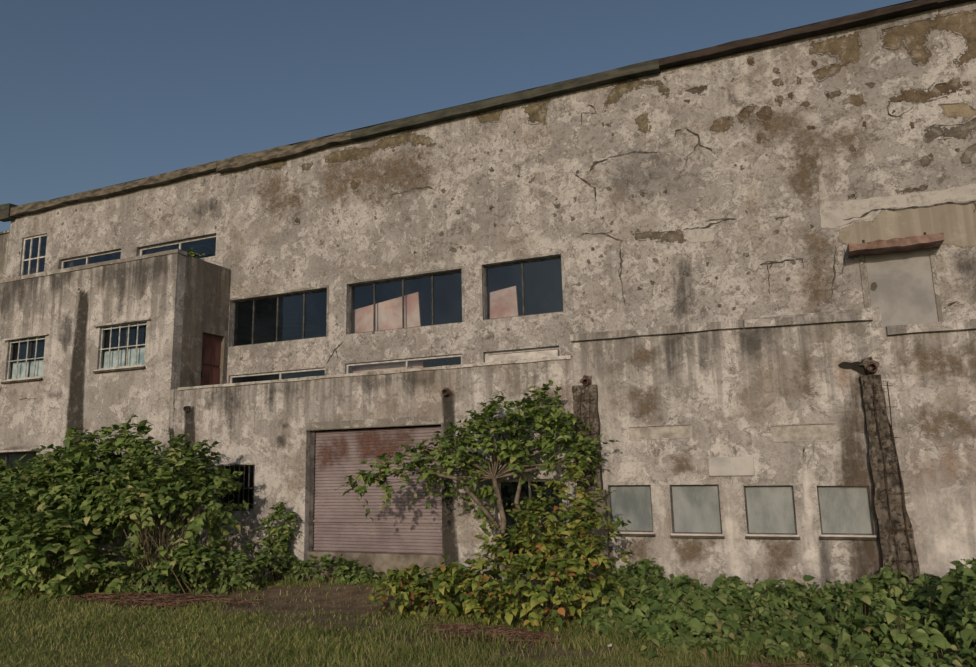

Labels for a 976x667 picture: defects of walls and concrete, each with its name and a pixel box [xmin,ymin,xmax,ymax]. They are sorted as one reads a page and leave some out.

spalling [603,78,670,108]
spalling [877,8,976,167]
crack [574,127,712,200]
crack [581,230,626,306]
spalling [630,228,691,244]
crack [760,258,804,293]
damp [62,293,88,451]
damp [912,350,976,375]
damp [842,374,882,583]
damp [654,481,744,581]
damp [768,465,827,578]
damp [921,490,976,574]